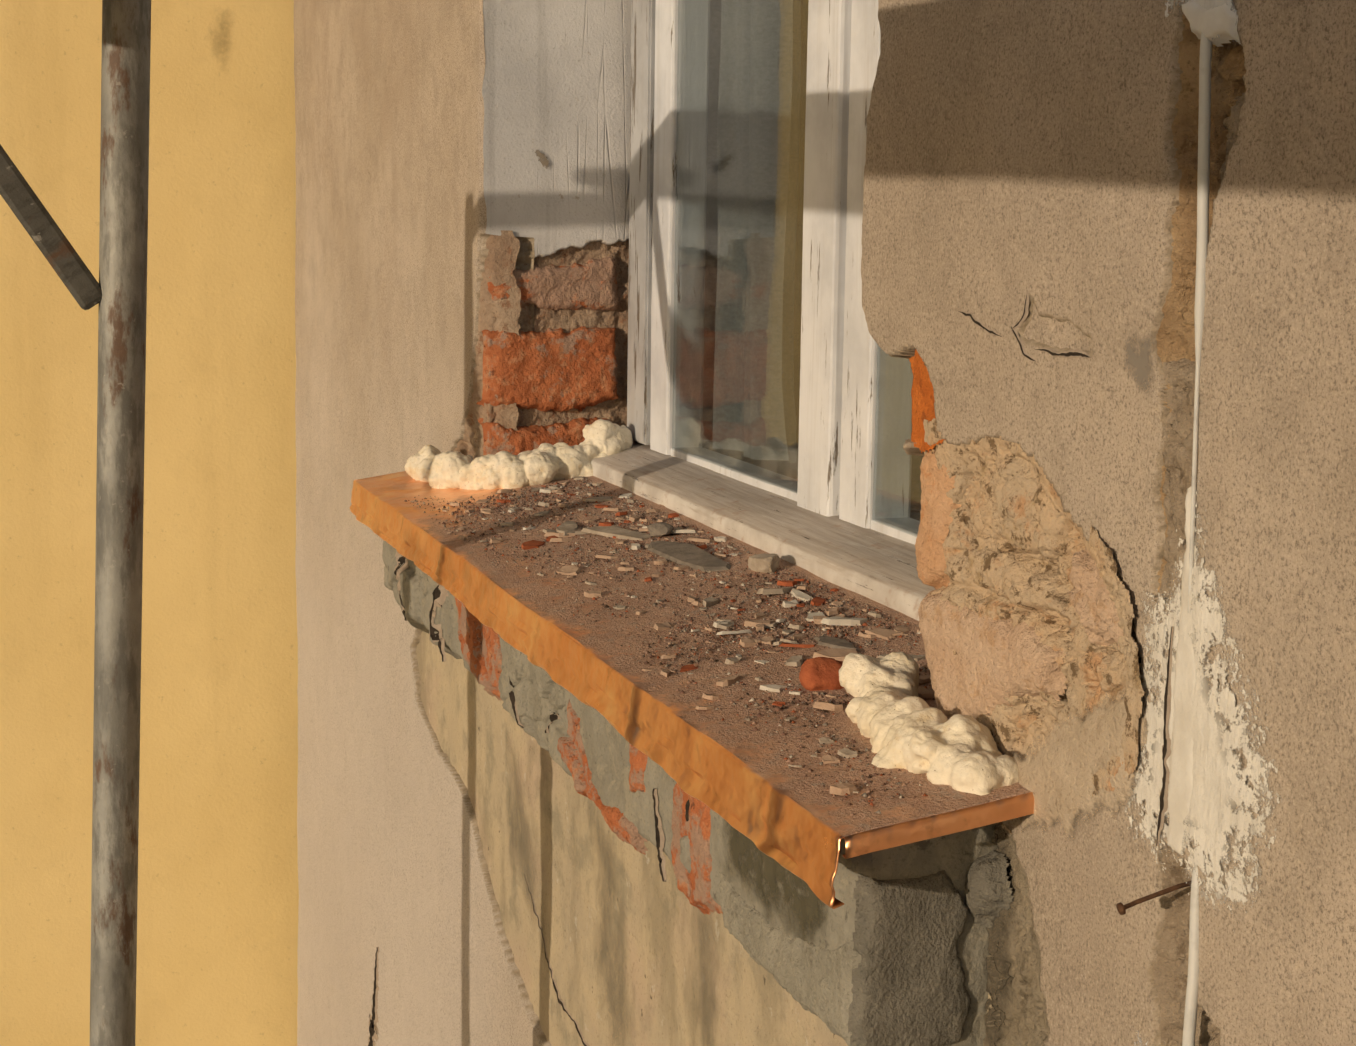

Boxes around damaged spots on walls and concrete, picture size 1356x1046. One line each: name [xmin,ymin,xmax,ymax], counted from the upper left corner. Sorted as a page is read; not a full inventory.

flaking render [453,230,629,459]
crack [958,290,1092,361]
flaking render [909,349,1148,1046]
crack [1156,626,1174,846]
crack [368,947,379,1046]
crack [524,874,589,1046]